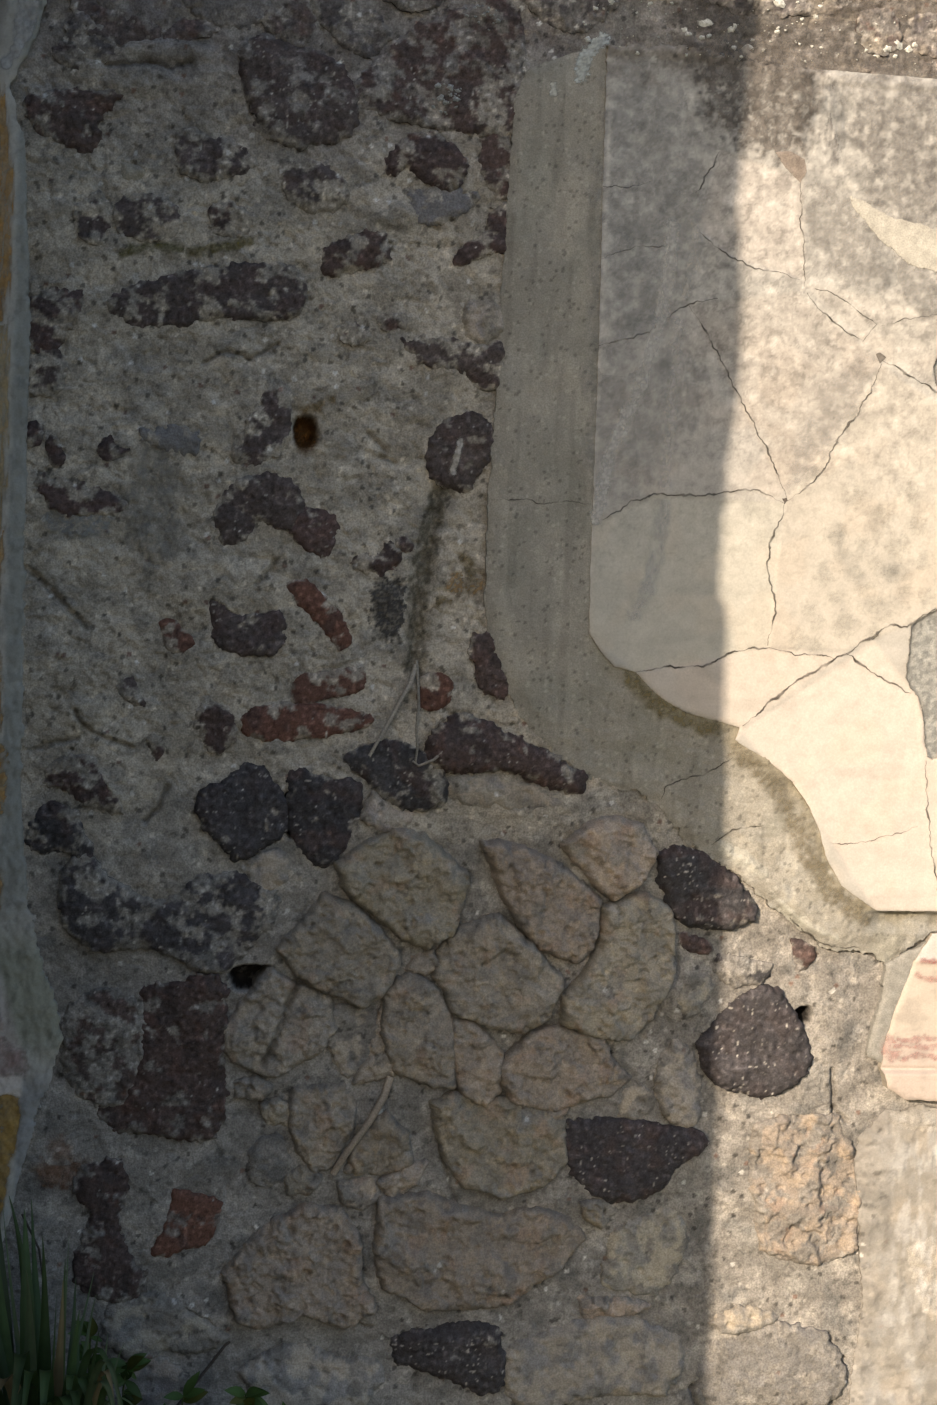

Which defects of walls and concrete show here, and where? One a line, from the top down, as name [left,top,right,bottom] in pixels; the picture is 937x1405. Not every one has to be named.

crack [500,186,935,726]
flaking render [905,609,937,760]
crack [661,761,728,799]
crack [837,765,937,878]